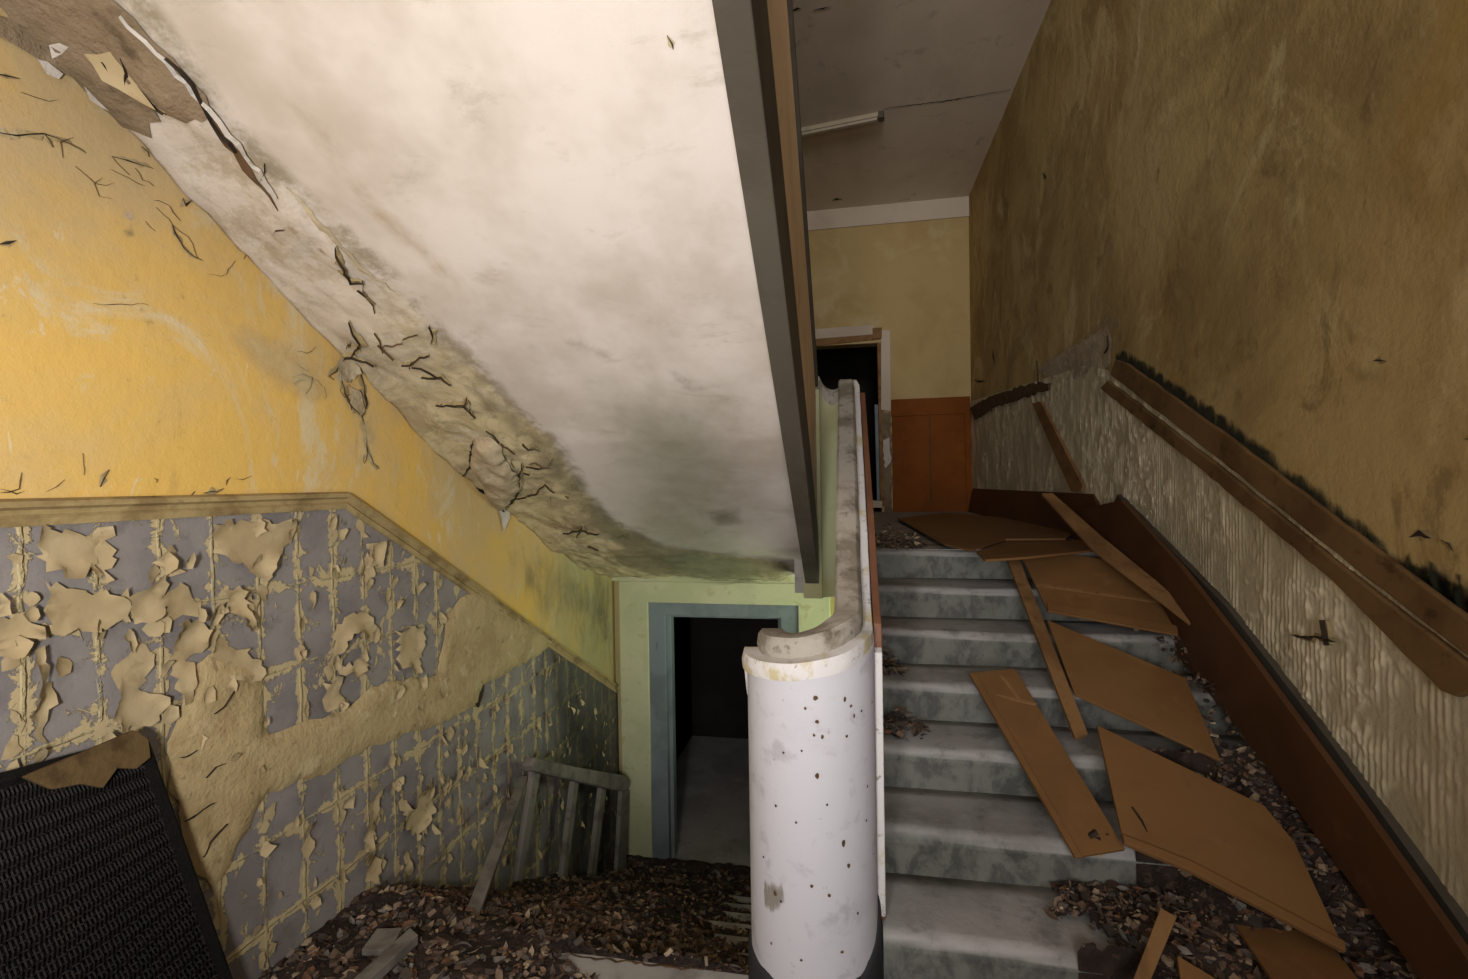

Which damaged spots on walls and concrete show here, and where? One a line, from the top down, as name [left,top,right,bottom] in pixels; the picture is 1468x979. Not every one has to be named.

crack [101,58,165,115]
crack [0,73,284,276]
spalling [0,0,395,292]
crack [293,246,476,470]
crack [500,443,569,500]
leakage [592,508,787,581]
leakage [1116,351,1468,613]
spalling [0,515,616,888]